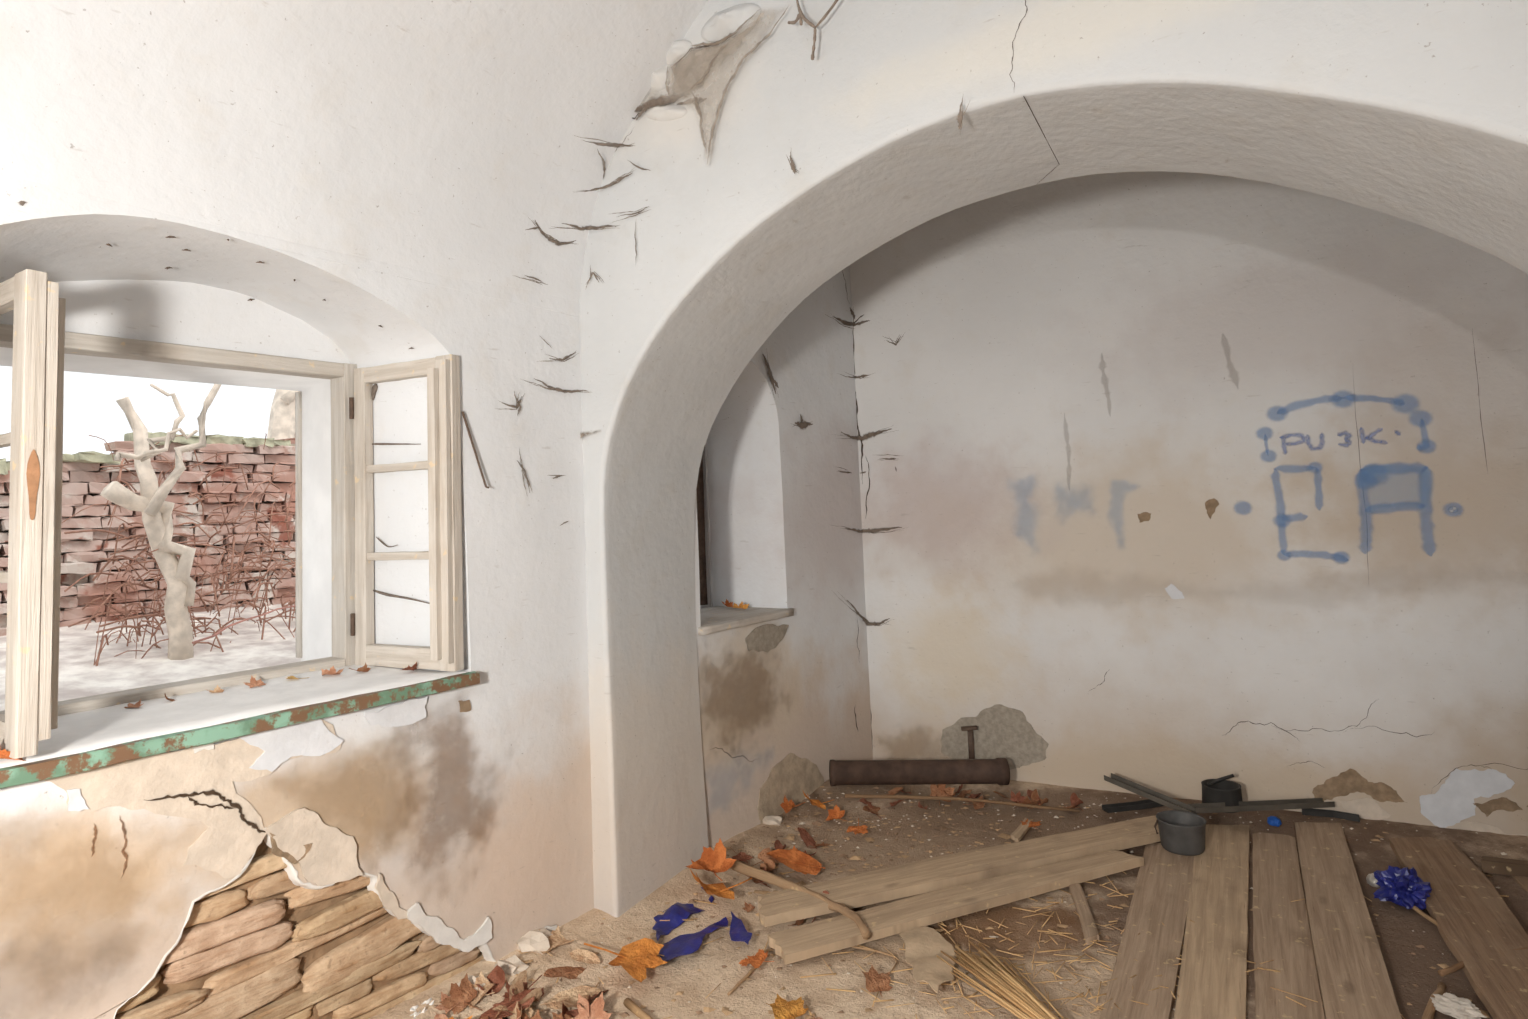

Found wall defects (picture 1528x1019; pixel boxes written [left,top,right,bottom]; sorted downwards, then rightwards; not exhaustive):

flaking render [673,14,761,95]
flaking render [940,704,1049,770]
crack [147,790,265,833]
flaking render [1312,768,1528,836]
flaking render [45,718,496,1019]